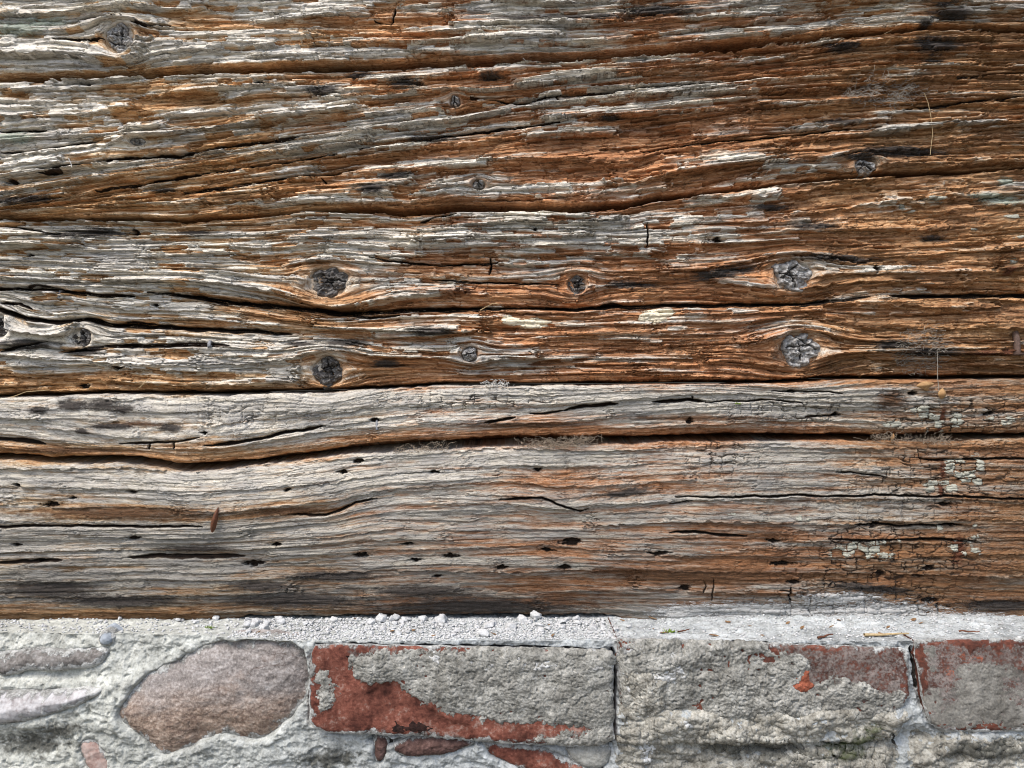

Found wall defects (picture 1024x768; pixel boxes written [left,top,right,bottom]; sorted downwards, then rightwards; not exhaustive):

crack [119,407,323,450]
crack [293,498,378,516]
crack [499,497,586,511]
crack [669,396,1024,616]
spalling [313,669,341,713]
spalling [348,638,1024,768]